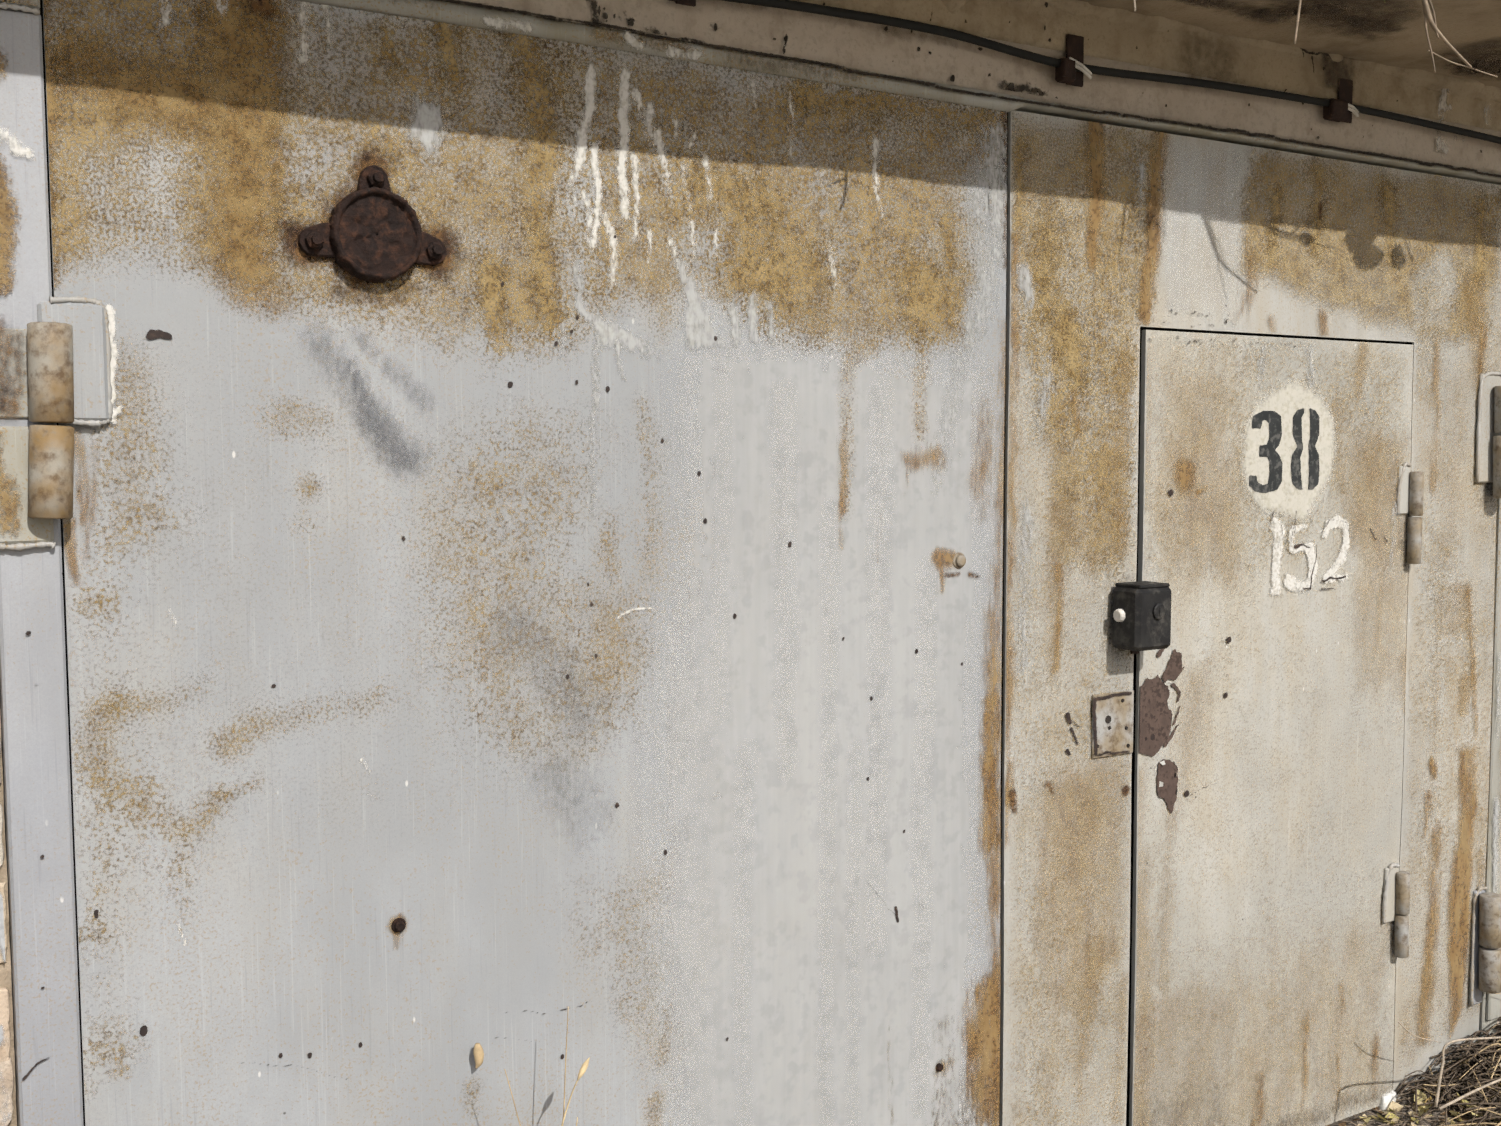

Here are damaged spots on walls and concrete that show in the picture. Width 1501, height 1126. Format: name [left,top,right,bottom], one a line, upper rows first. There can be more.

water stain [1181,0,1412,39]
corrosion [0,0,1167,1126]
corrosion [1152,342,1401,578]
corrosion [1239,150,1501,1053]
peeling [1093,649,1204,813]